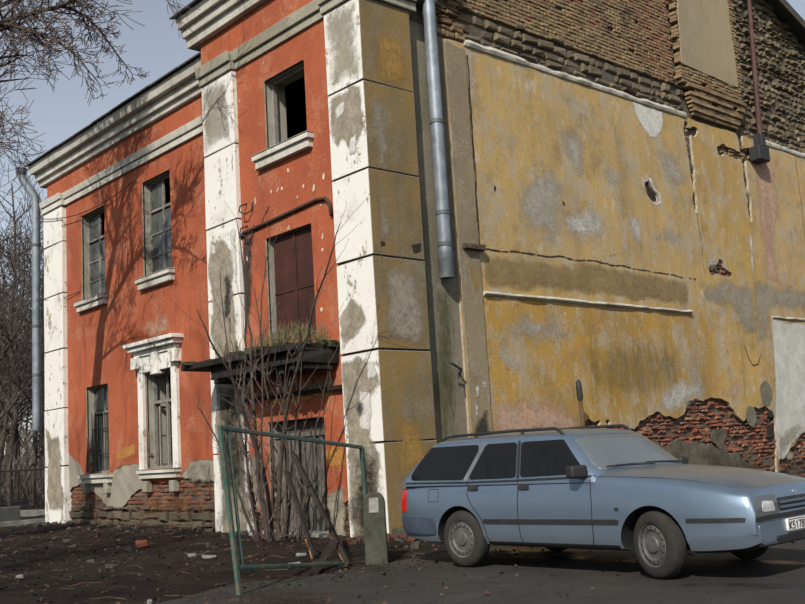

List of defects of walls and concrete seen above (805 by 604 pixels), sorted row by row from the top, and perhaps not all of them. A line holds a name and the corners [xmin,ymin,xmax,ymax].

peeling [327,8,357,81]
peeling [330,86,363,155]
peeling [633,102,663,137]
crack [467,55,705,280]
peeling [208,228,248,358]
peeling [340,299,365,346]
leakage [486,258,688,302]
peeling [215,384,266,533]
peeling [327,357,380,537]
peeling [495,399,574,434]
flaking render [585,363,805,473]
leakage [353,460,378,534]